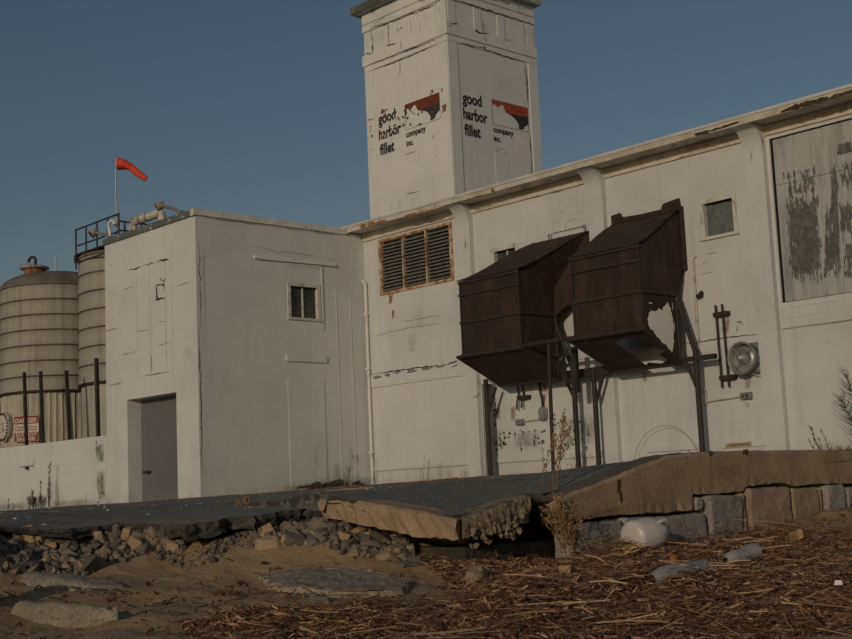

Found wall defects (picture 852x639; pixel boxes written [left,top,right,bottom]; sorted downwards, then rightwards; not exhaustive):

spalling [780,90,852,113]
spalling [694,121,739,136]
peeling [783,142,852,285]
peeling [648,302,675,352]
peeling [493,403,545,452]